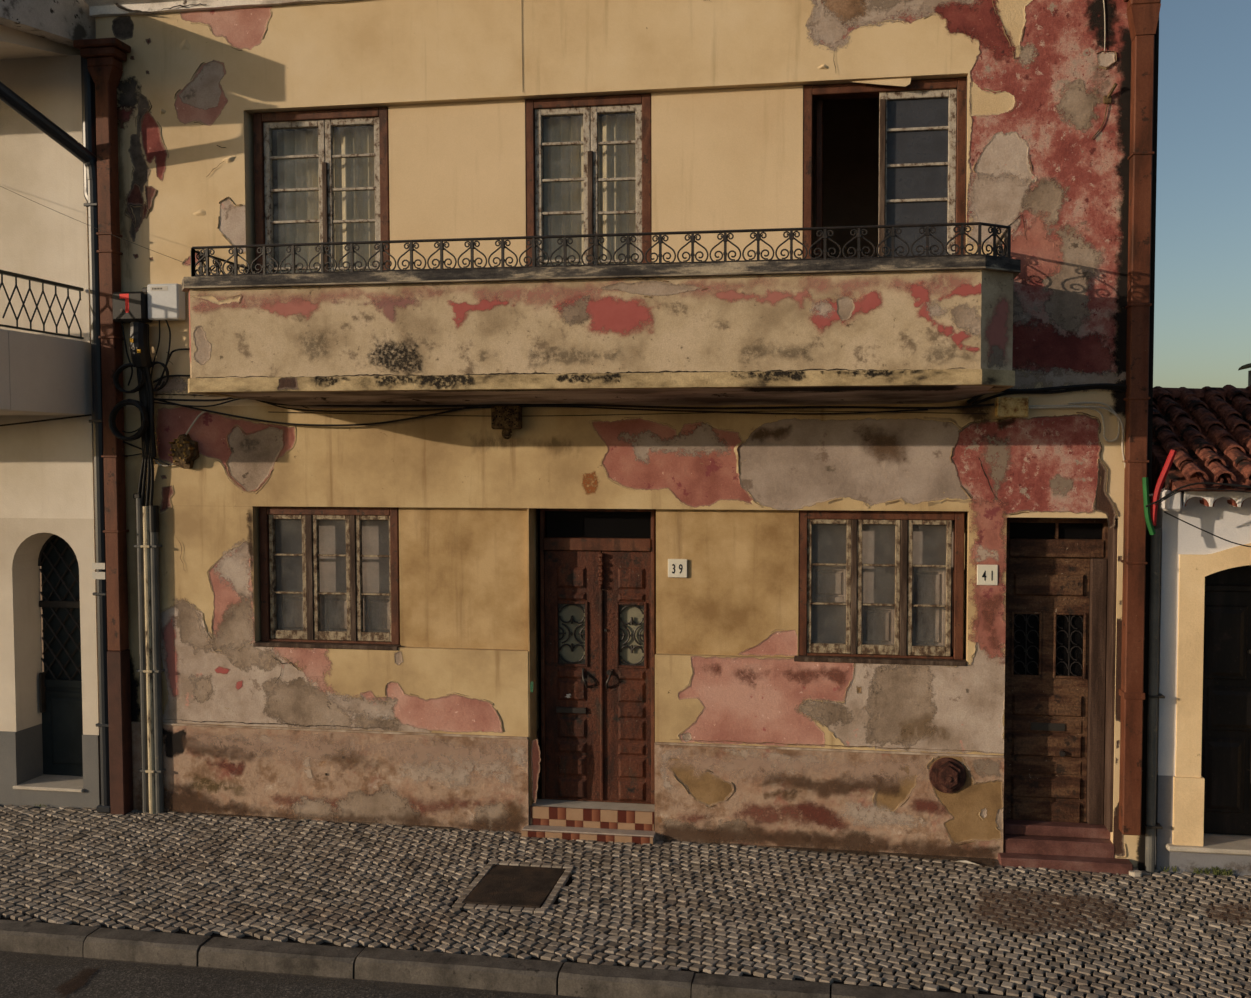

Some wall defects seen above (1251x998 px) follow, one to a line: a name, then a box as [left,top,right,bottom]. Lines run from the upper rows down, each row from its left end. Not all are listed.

peeling [117,70,169,260]
spalling [217,197,246,254]
peeling [806,0,1129,391]
peeling [449,278,882,335]
damp [370,340,621,392]
spalling [156,406,297,514]
spalling [160,541,504,733]
spalling [589,412,1118,850]
damp [164,786,260,815]
damp [163,728,358,778]
damp [370,740,527,833]
damp [661,749,1001,859]